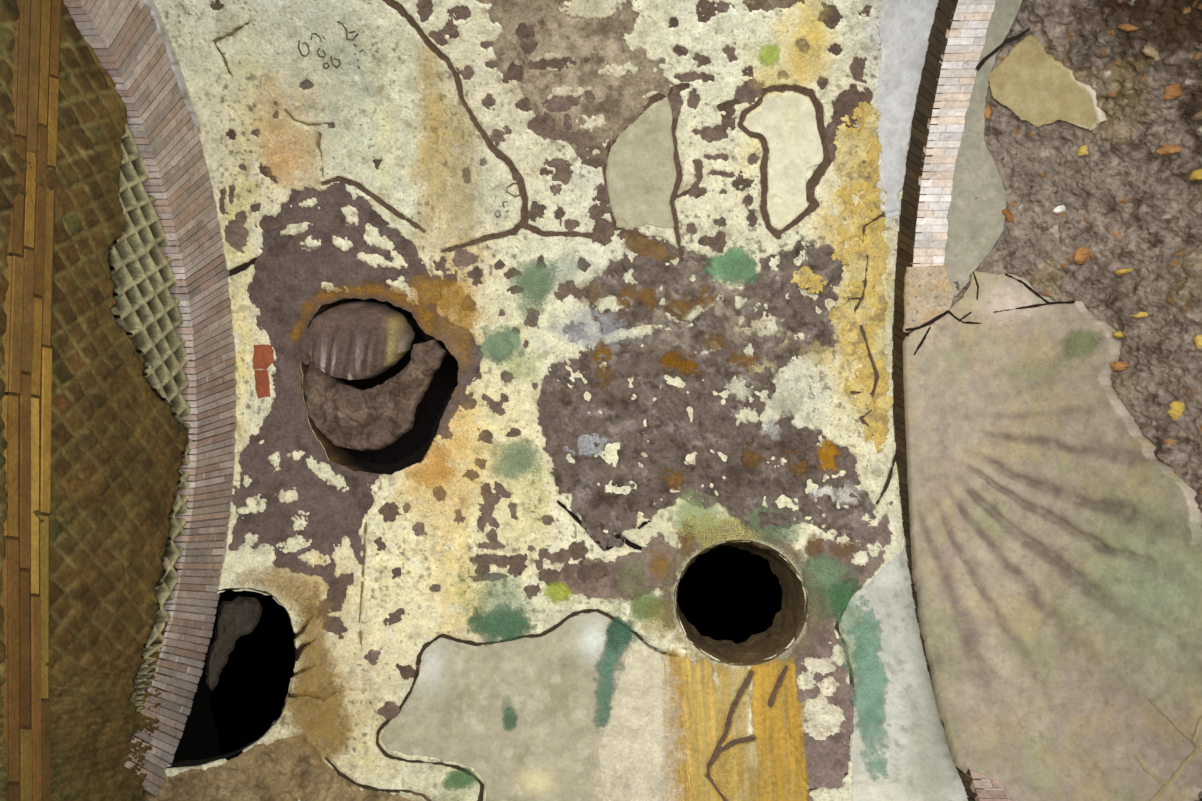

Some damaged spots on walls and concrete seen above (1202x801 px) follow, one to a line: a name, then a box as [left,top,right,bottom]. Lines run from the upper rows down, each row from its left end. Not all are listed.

crack [285,0,703,261]
crack [718,84,832,239]
flaking render [219,183,540,639]
corrosion [292,278,474,357]
flaking render [416,0,894,801]
crack [848,212,893,427]
crack [905,271,1075,355]
flaking render [142,736,412,801]
flaking render [396,663,419,680]
crack [324,609,679,801]
corrosion [662,651,808,801]
leakage [593,492,888,801]